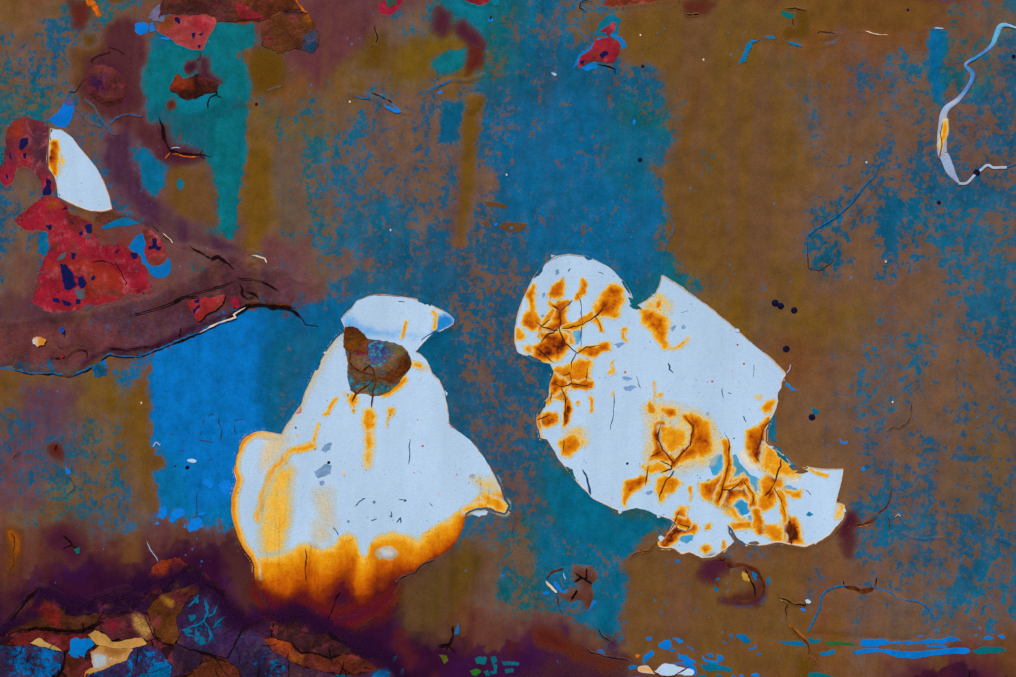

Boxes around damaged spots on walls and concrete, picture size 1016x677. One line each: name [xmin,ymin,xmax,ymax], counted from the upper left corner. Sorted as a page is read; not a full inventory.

peeling [135,4,219,53]
peeling [0,98,171,315]
crack [0,591,103,677]
rust [44,524,88,569]
crack [91,593,370,677]
peeling [155,289,514,605]
rust [230,335,509,677]
rust [516,277,628,458]
rust [638,293,690,350]
peeling [509,248,850,563]
spalling [628,637,759,677]
rust [621,381,829,584]